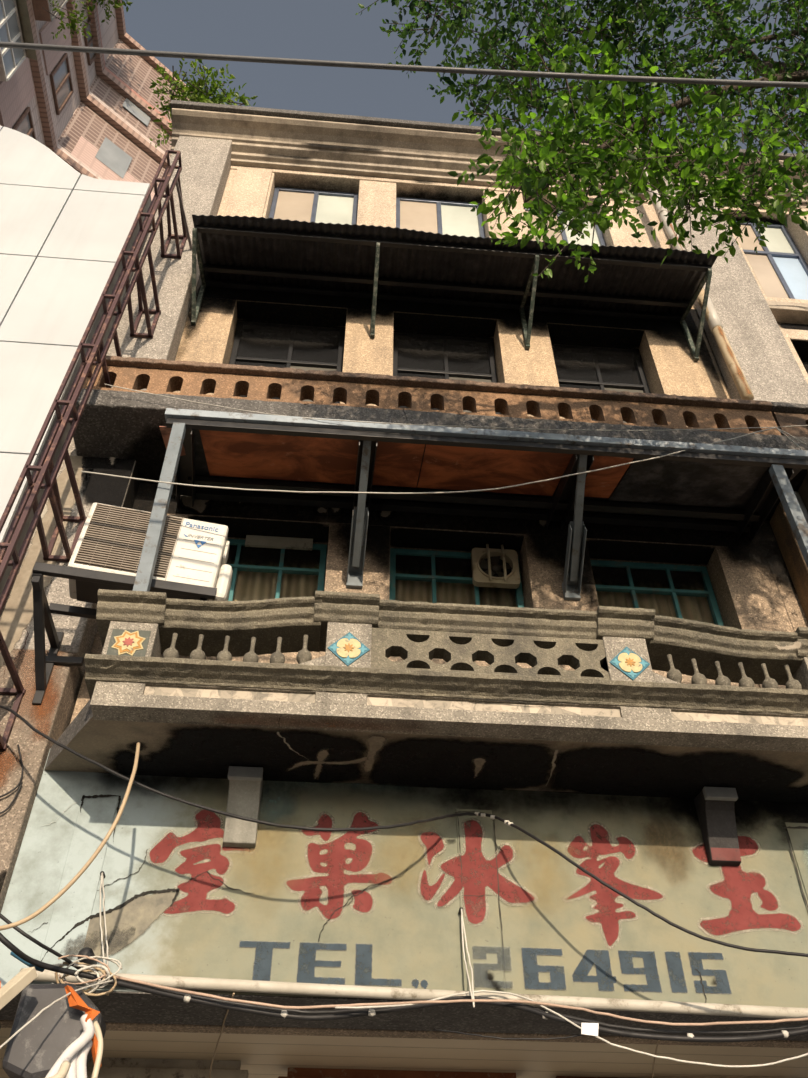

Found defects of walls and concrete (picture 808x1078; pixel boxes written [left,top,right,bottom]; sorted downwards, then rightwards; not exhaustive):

crack [80,794,121,842]
crack [29,849,255,961]